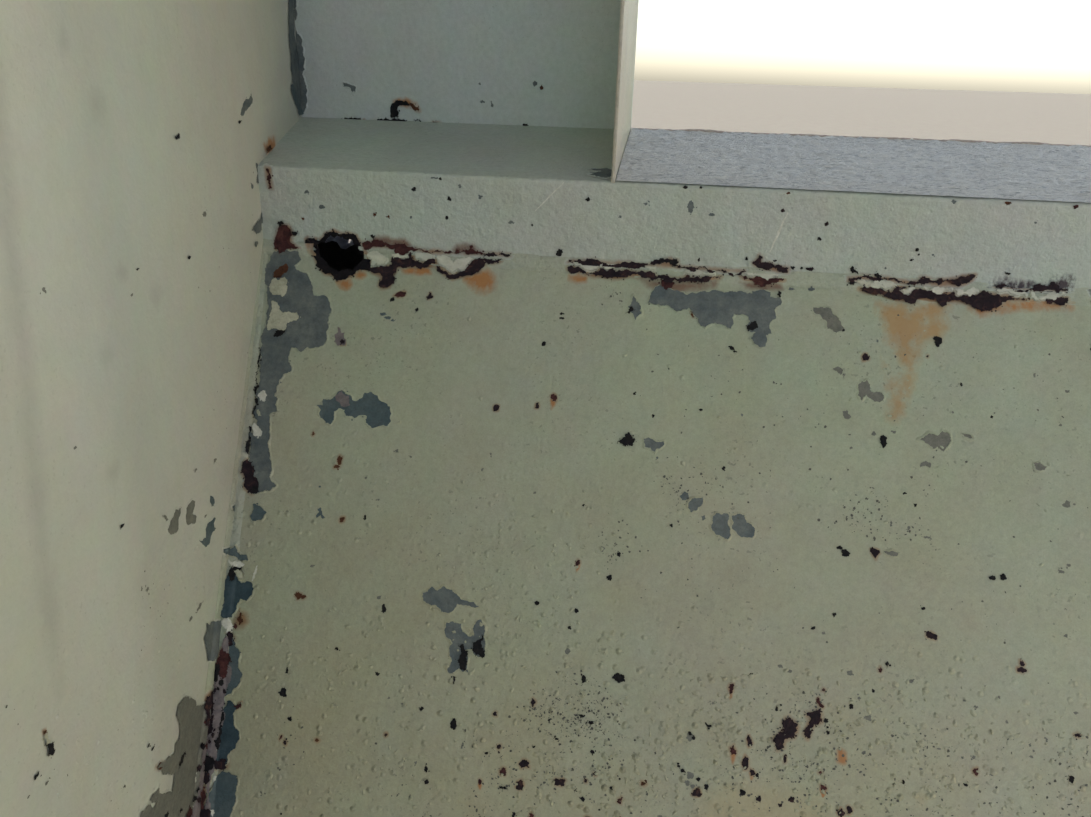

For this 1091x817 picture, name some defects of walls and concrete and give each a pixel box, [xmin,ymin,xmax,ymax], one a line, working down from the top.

corrosion [390,94,424,118]
peeling [247,249,348,523]
peeling [315,389,393,430]
corrosion [272,217,515,302]
corrosion [415,290,436,312]
corrosion [556,249,815,297]
peeling [626,285,794,349]
corrosion [844,266,1091,448]
peeling [680,491,756,541]
peeling [138,493,256,817]
peeling [421,584,488,684]
corrosion [677,731,856,817]